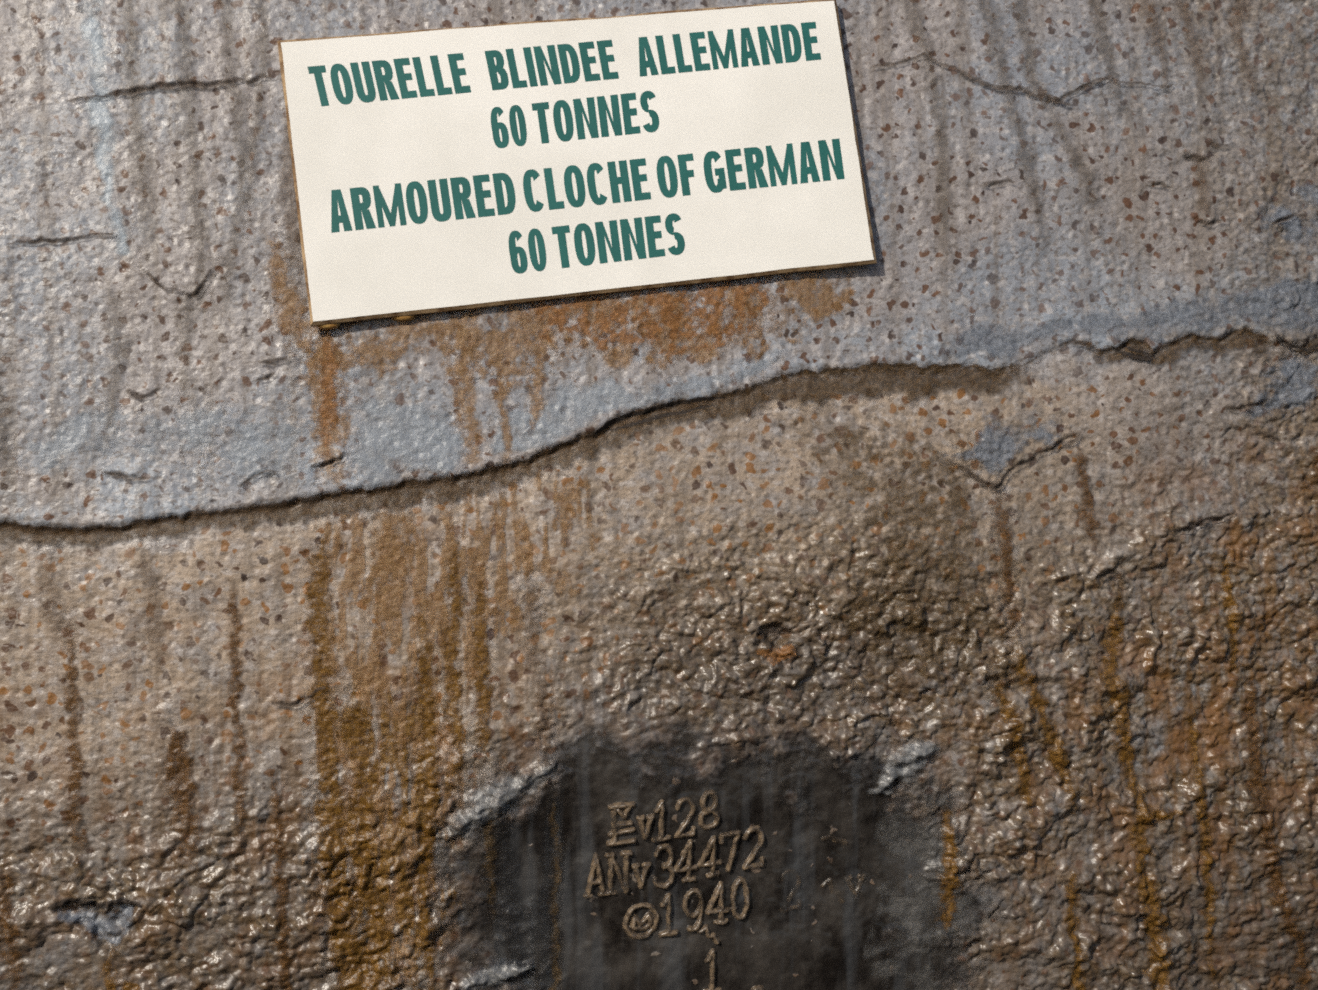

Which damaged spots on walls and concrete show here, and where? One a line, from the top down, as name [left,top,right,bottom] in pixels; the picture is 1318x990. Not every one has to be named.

crack [66,75,271,102]
crack [870,53,1173,106]
crack [7,232,113,245]
crack [0,363,1025,546]
rust [268,241,854,482]
rust [812,427,990,674]
crack [1059,327,1318,365]
rust [62,641,87,864]
rust [227,592,247,851]
rust [305,467,594,990]
water stain [865,813,980,990]
rust [1100,594,1217,990]